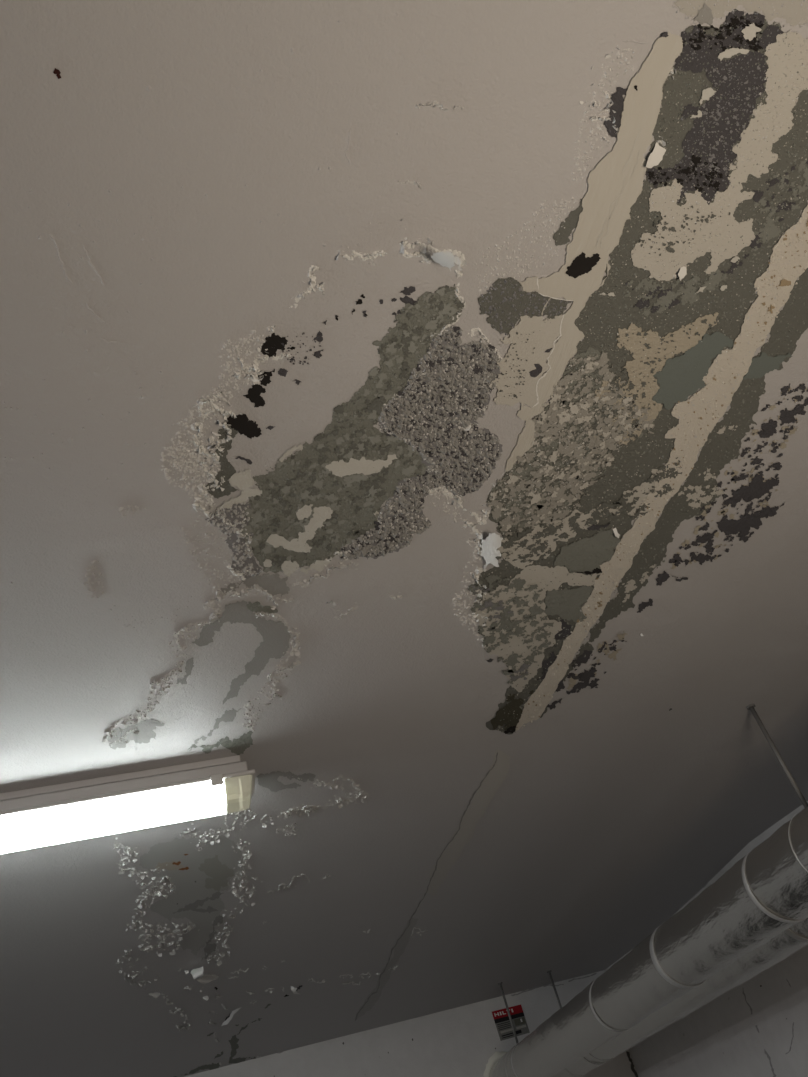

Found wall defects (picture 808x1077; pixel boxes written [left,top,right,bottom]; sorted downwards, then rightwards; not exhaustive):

water stain [640,0,808,256]
water stain [624,159,808,317]
water stain [743,352,793,380]
water stain [217,285,499,597]
water stain [488,319,734,573]
water stain [468,575,594,684]
peeling [103,707,165,750]
water stain [491,698,524,734]
peeling [112,771,369,1077]
crack [626,1051,638,1077]
crack [742,990,794,1077]